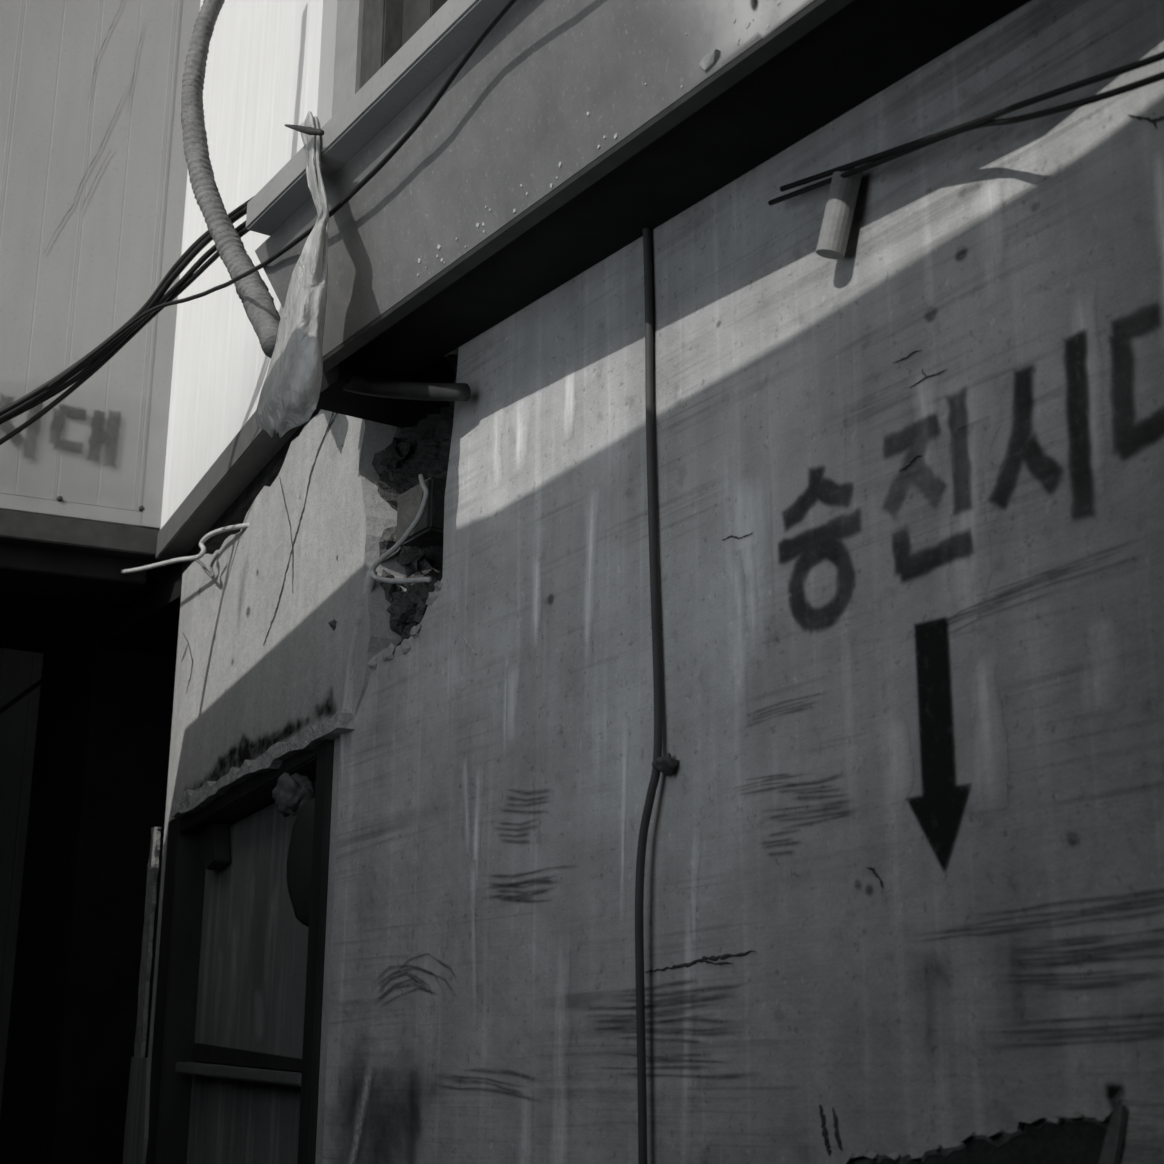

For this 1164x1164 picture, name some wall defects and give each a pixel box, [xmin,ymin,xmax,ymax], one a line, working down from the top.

crack [1127,114,1164,129]
spalling [446,354,458,383]
spalling [367,401,455,671]
crack [645,950,755,973]
peeling [819,1104,1112,1164]